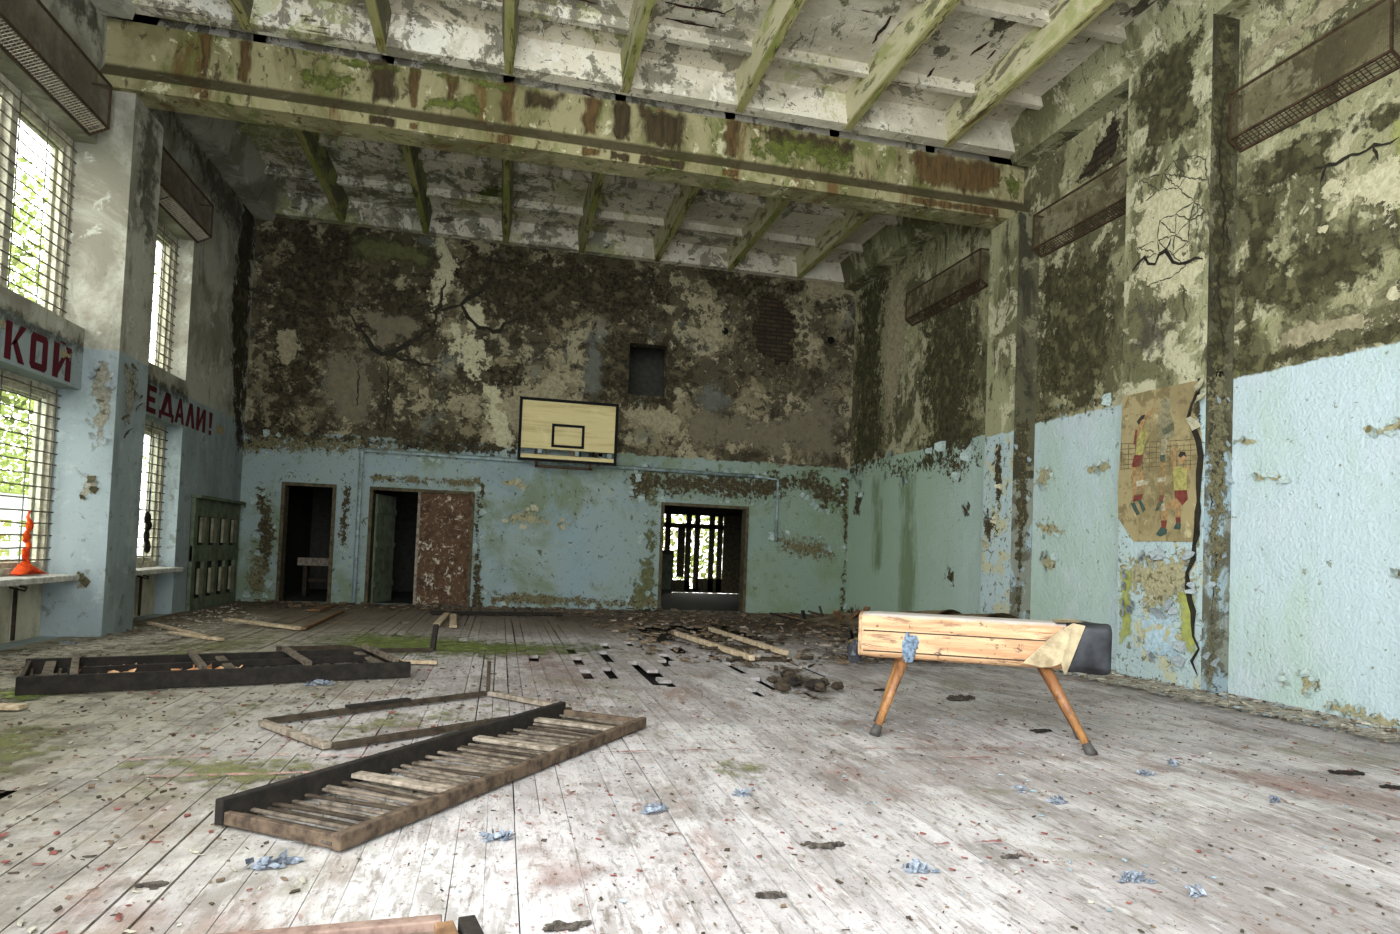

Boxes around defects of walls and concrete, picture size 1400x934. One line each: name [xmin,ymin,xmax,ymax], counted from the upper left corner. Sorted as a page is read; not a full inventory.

corrosion [369,60,421,130]
water stain [136,111,696,460]
corrosion [497,82,565,144]
corrosion [582,96,685,170]
spalling [242,237,1118,616]
water stain [1036,238,1119,423]
crack [1132,93,1231,355]
spalling [1120,369,1256,686]
crack [1185,378,1217,674]
water stain [1126,11,1400,372]
peeling [1251,471,1291,483]
crack [1313,137,1399,182]